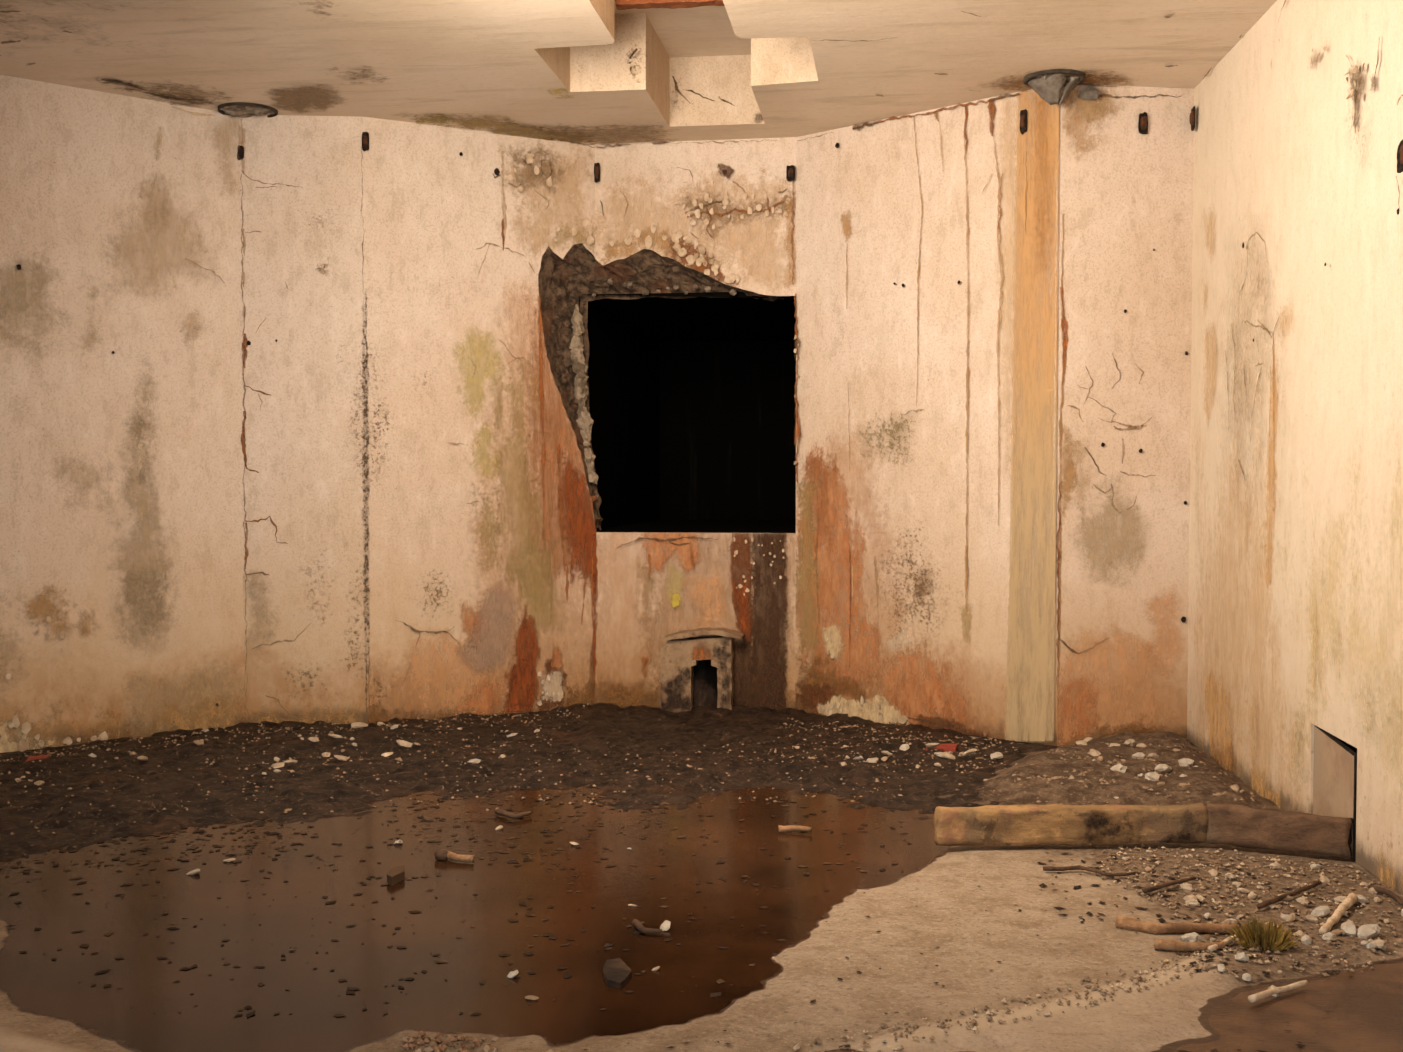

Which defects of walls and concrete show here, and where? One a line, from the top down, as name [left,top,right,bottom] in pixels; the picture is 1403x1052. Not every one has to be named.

water stain [101,79,229,116]
water stain [272,85,339,112]
water stain [120,420,169,642]
crack [185,170,310,718]
rust [496,296,655,714]
spalling [538,221,801,531]
rust [797,449,975,730]
water stain [881,534,932,629]
water stain [907,71,1180,746]